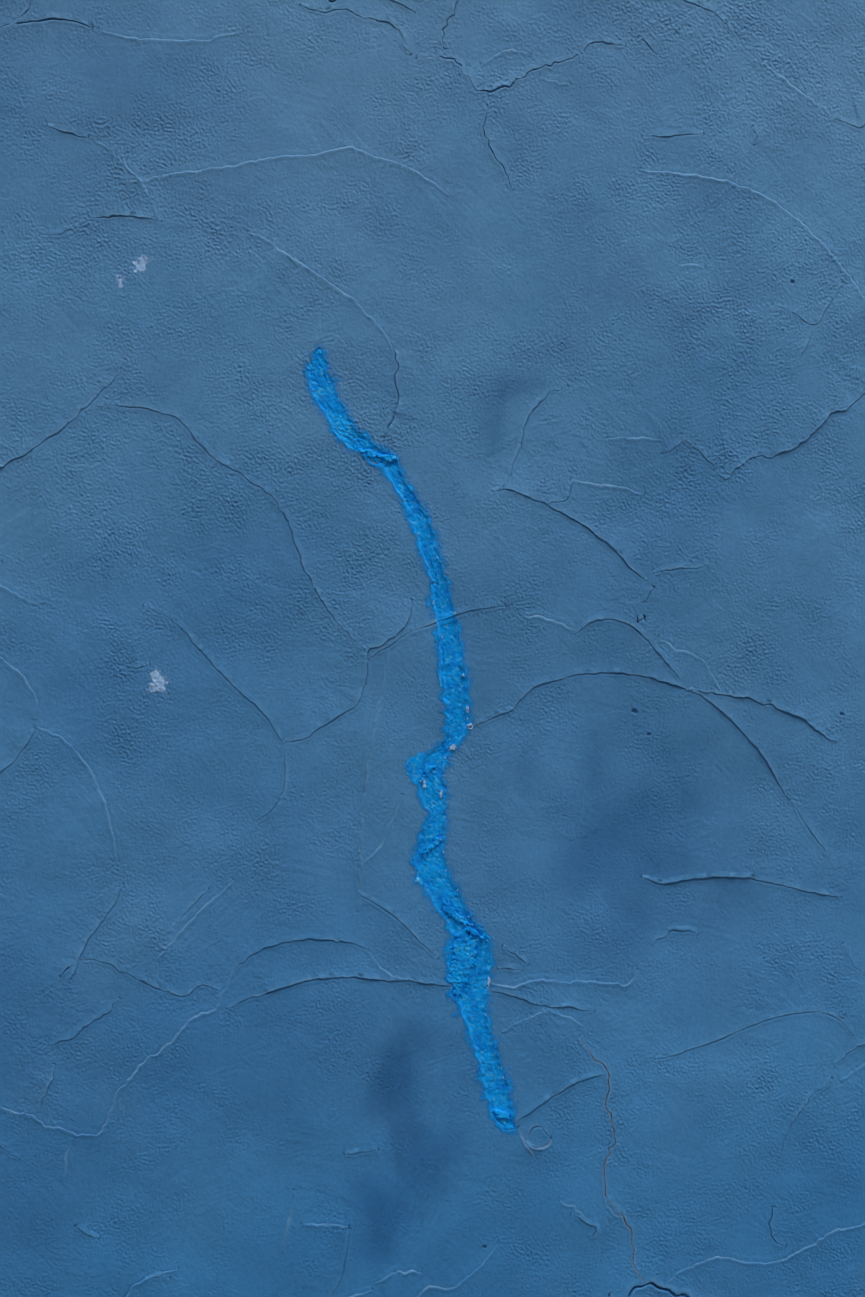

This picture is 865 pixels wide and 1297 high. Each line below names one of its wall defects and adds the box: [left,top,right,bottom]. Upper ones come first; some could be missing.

crack [379,0,658,191]
crack [303,346,865,1297]